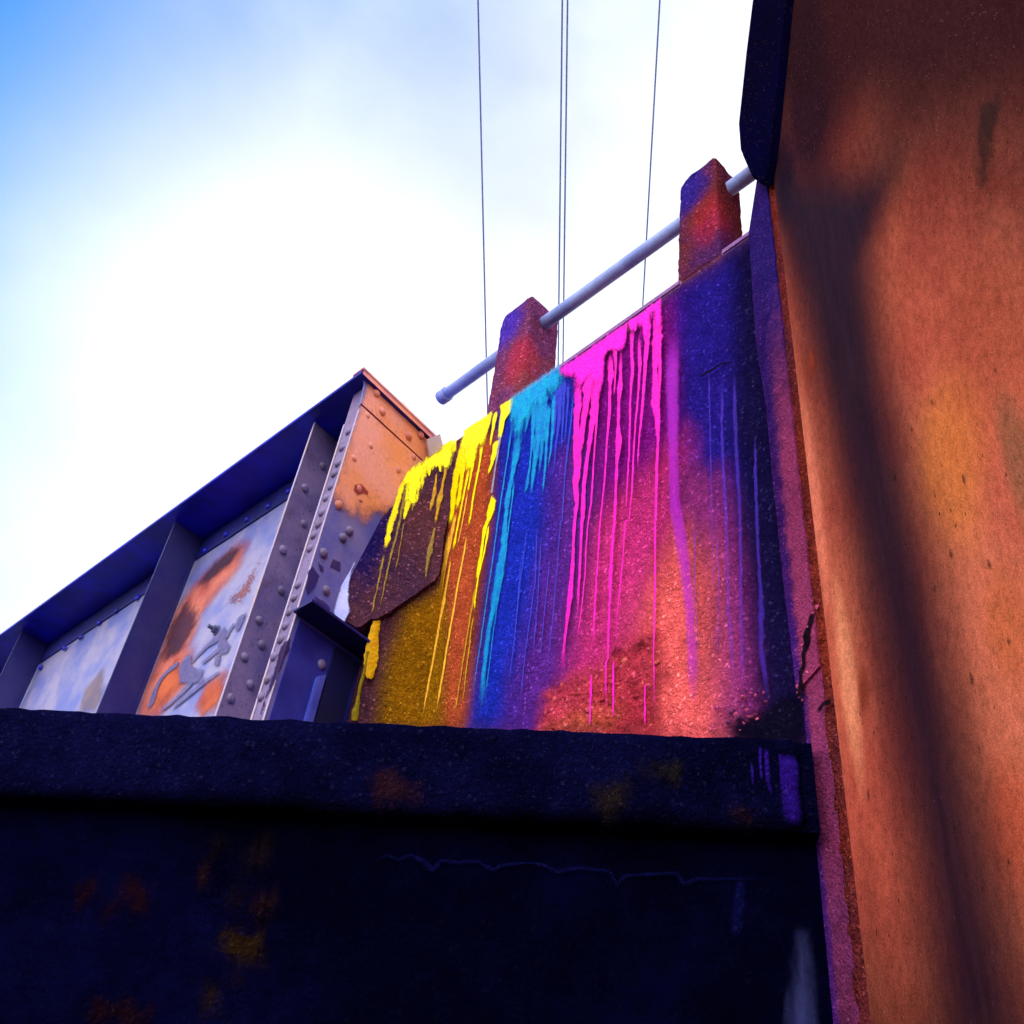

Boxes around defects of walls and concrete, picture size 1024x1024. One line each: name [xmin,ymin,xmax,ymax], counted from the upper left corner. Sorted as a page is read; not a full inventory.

rust [138,545,260,717]
crack [796,600,819,701]